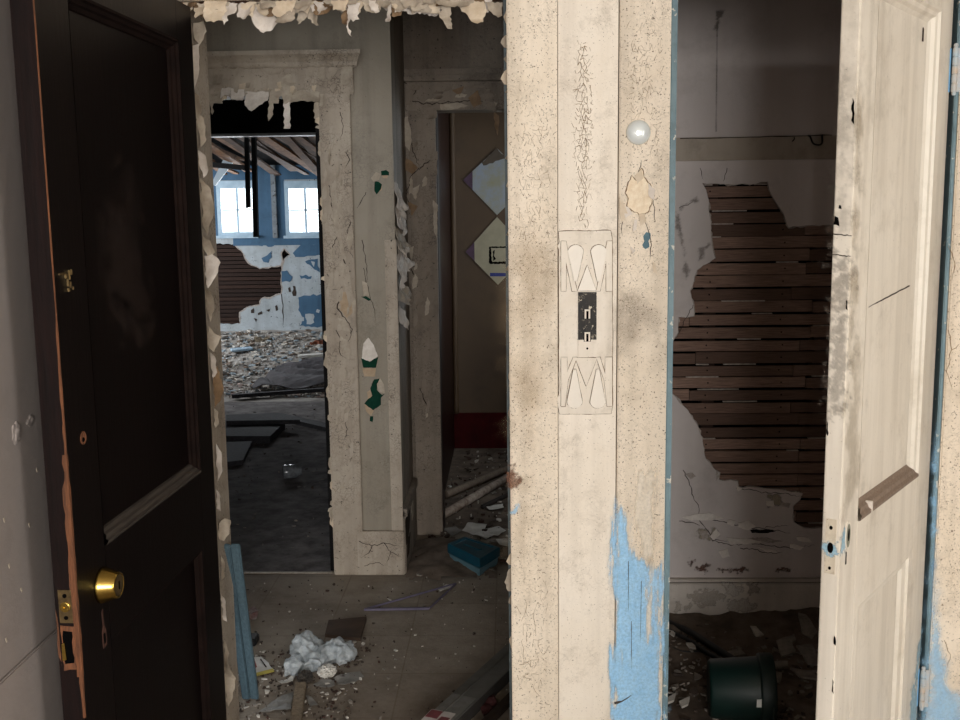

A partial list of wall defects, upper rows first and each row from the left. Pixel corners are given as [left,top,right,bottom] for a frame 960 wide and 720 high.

peeling [183,0,507,428]
peeling [619,165,657,274]
crack [322,86,355,489]
flaking render [672,182,842,558]
peeling [216,444,231,541]
crack [338,529,398,566]
peeling [609,470,666,720]
crack [682,470,722,541]
peeling [224,640,236,706]
peeling [926,631,960,720]